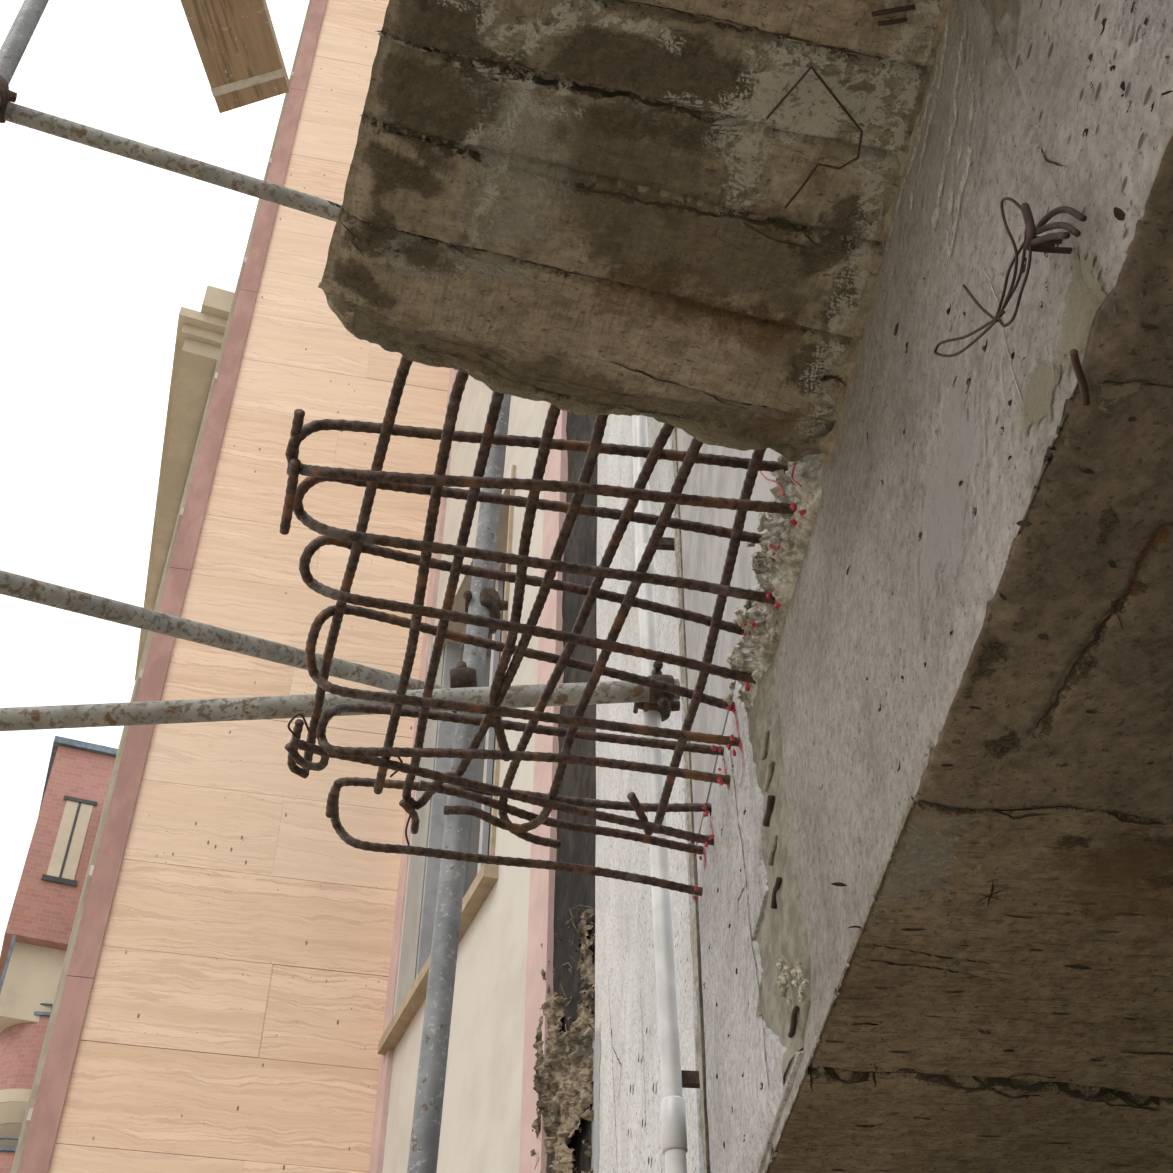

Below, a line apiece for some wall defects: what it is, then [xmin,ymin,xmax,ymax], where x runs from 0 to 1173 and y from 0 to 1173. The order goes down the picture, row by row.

crack [377,30,797,134]
crack [587,0,889,70]
crack [359,115,814,246]
damp [334,0,974,438]
spalling [280,292,824,1078]
crack [916,801,1173,825]
crack [808,1063,1173,1111]
crack [1123,1049,1173,1057]